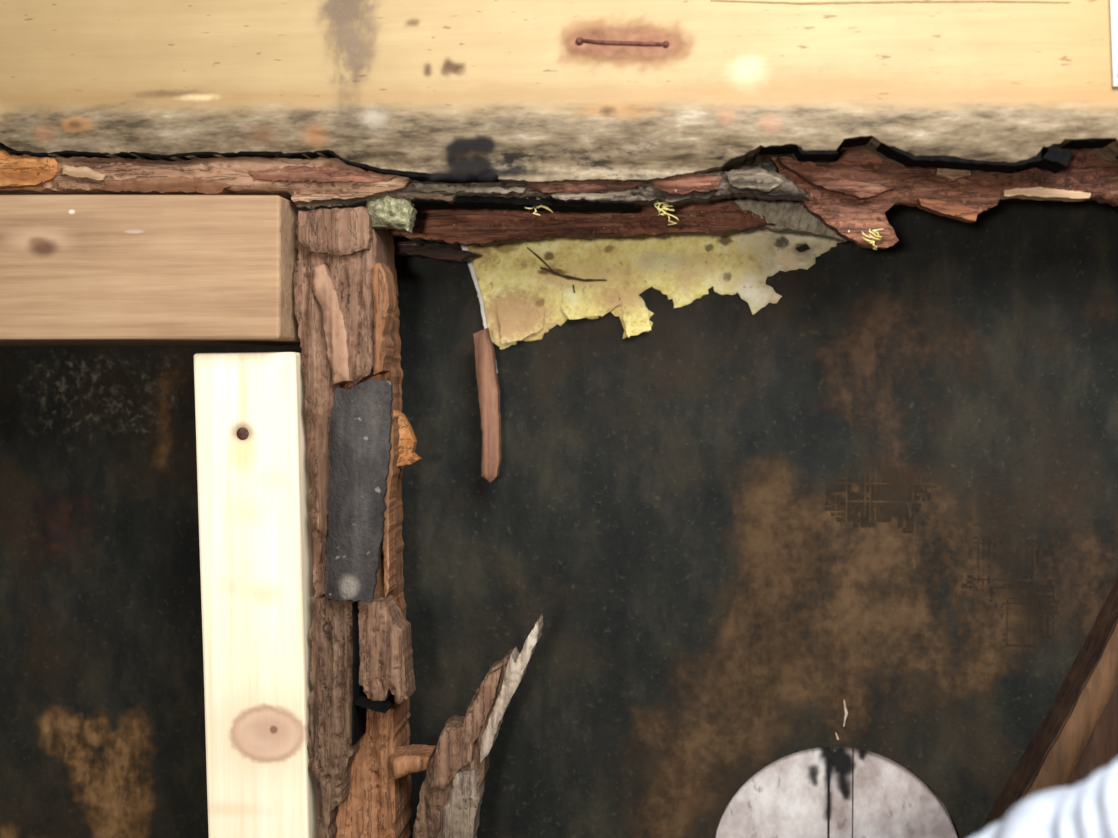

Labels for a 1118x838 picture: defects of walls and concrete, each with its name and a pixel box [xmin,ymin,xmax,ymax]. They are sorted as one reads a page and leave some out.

corrosion [566,24,686,60]
spalling [429,135,525,180]
peeling [461,227,847,373]
leakage [842,304,901,404]
crack [352,600,395,746]
peeling [388,665,503,789]
leakage [640,442,1022,838]
leakage [1049,535,1111,632]